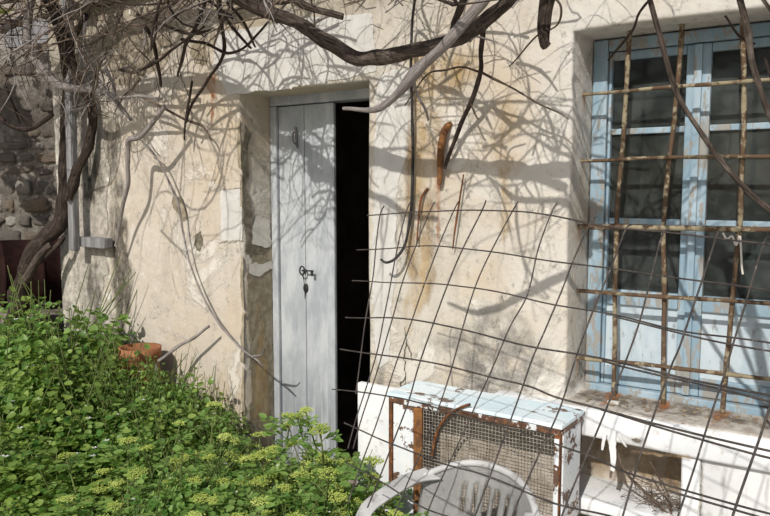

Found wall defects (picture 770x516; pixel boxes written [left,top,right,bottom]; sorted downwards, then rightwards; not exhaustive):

damp [84,153,103,204]
damp [87,265,101,322]
damp [105,120,122,196]
damp [111,206,131,345]
flaking render [172,197,187,221]
flaking render [193,231,203,251]
flaking render [237,119,275,476]
damp [445,315,535,388]